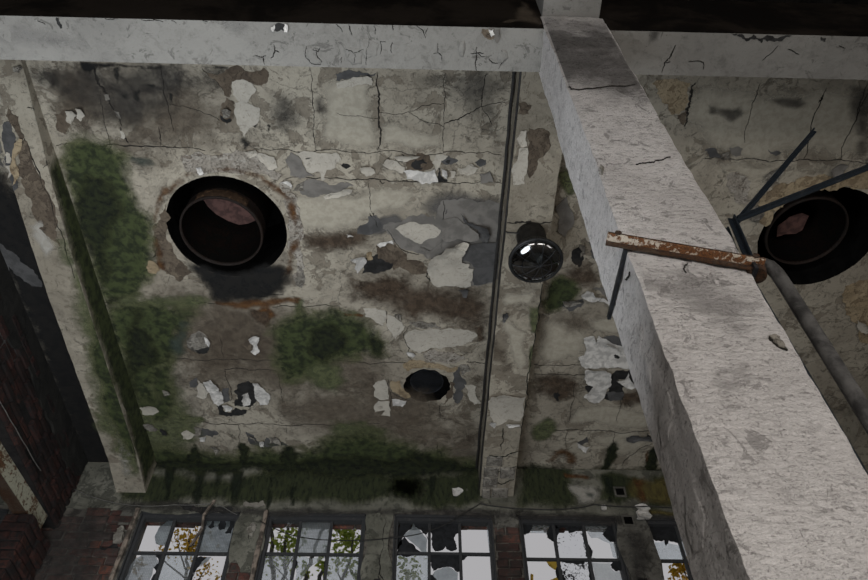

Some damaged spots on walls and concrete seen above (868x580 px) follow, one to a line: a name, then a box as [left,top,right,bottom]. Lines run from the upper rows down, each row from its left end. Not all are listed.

peeling [202,65,269,138]
crack [254,24,506,226]
peeling [285,150,493,200]
crack [635,156,671,165]
crack [705,84,868,164]
water stain [74,176,123,279]
water stain [122,139,402,423]
peeling [348,198,503,298]
water stain [89,320,136,454]
peeling [189,378,270,417]
water stain [152,324,479,505]
peeling [578,335,636,404]